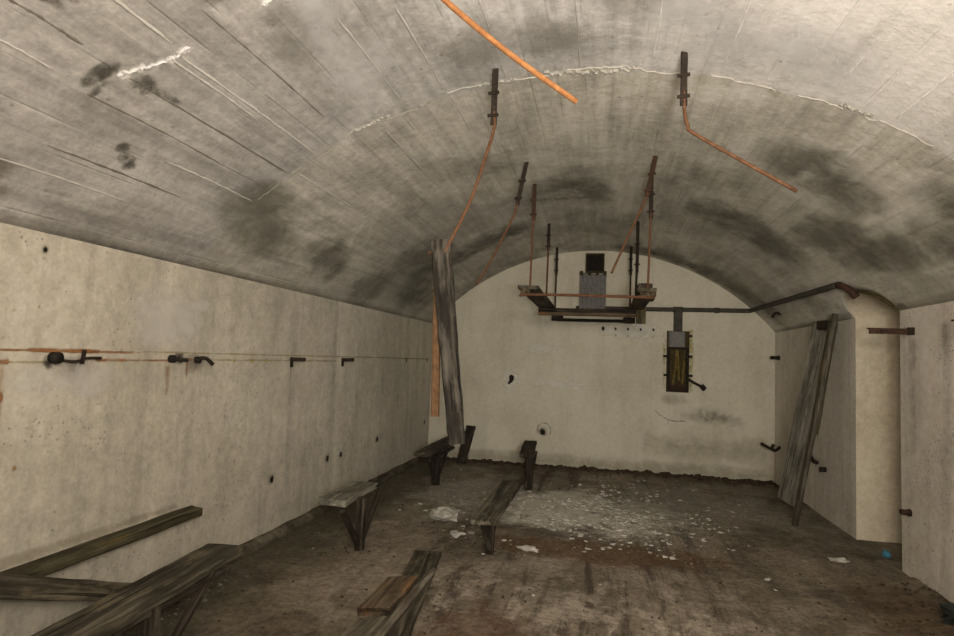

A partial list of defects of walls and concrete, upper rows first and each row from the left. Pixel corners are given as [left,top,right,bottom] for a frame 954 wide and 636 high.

crack [201,9,323,116]
crack [711,75,775,91]
crack [83,46,681,200]
crack [798,95,933,147]
crack [47,145,180,198]
water stain [116,143,135,169]
corrosion [0,348,420,376]